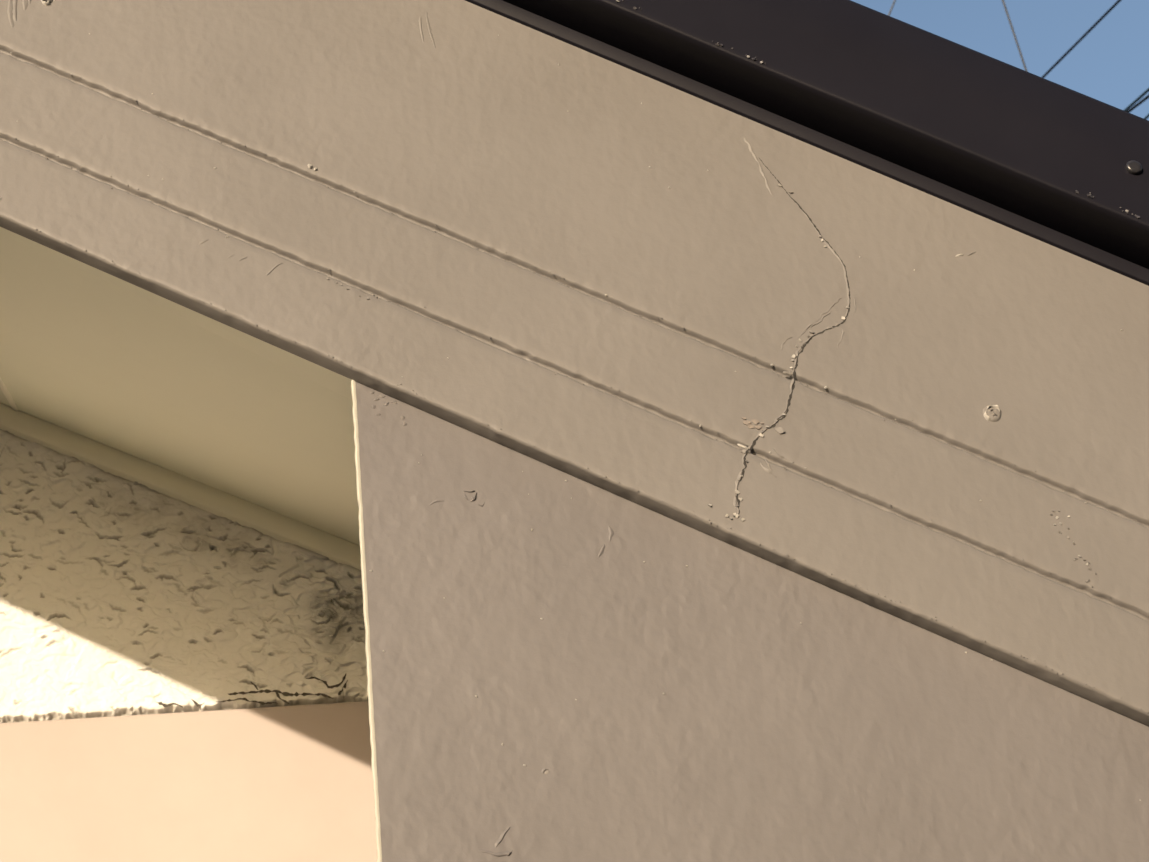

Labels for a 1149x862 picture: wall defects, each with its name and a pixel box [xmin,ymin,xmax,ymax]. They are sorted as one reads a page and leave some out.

crack [733,137,856,517]